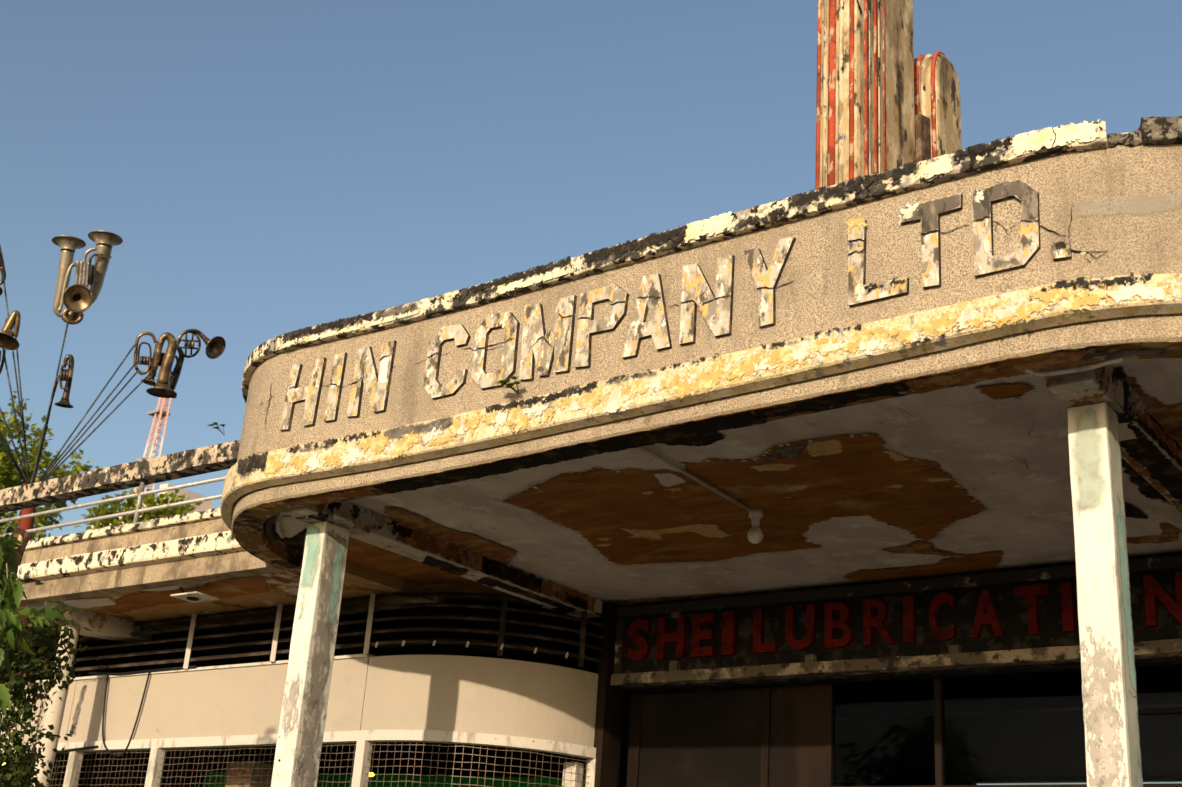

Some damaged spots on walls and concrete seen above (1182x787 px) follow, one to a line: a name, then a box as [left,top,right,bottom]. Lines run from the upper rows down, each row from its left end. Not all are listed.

peeling [1010,120,1103,156]
peeling [916,154,954,181]
peeling [684,211,734,243]
peeling [898,202,919,223]
crack [921,204,1108,263]
peeling [496,266,571,294]
peeling [263,277,1182,477]
peeling [273,348,1182,787]
peeling [60,576,269,615]
peeling [69,685,86,735]